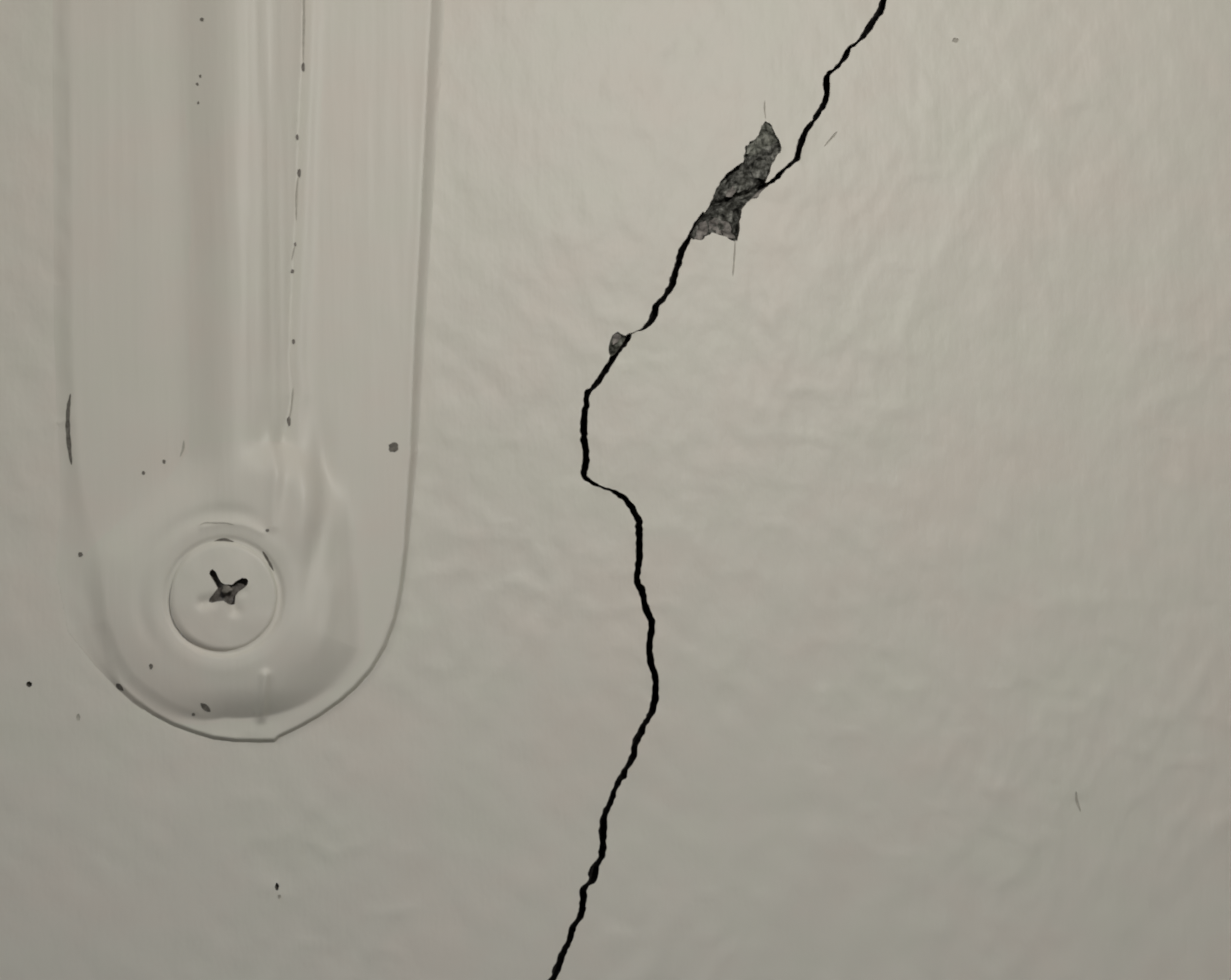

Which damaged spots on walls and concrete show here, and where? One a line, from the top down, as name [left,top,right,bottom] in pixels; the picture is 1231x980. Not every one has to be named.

spalling [689,121,781,241]
crack [758,0,887,189]
crack [548,212,703,980]